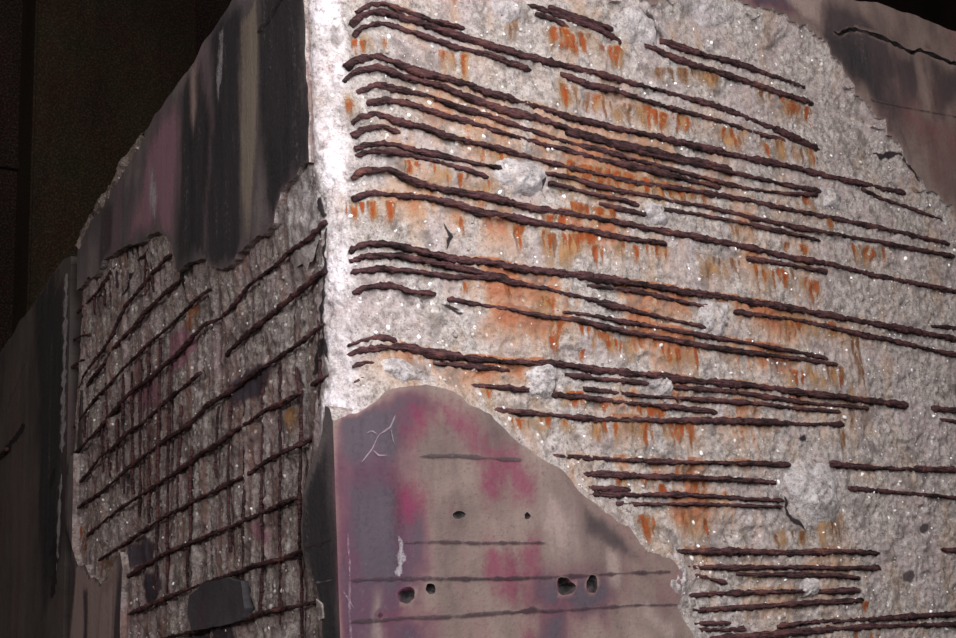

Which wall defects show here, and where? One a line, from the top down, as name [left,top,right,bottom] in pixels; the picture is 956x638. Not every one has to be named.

crack [833,27,956,65]
leakage [131,0,308,263]
corrosion [558,81,692,133]
crack [873,151,920,182]
corrosion [346,200,396,221]
corrosion [542,201,616,266]
spalling [71,201,329,483]
spalling [794,312,956,352]
spalling [76,371,203,579]
spalling [86,392,324,638]
leakage [544,495,578,557]
leakage [537,516,627,638]